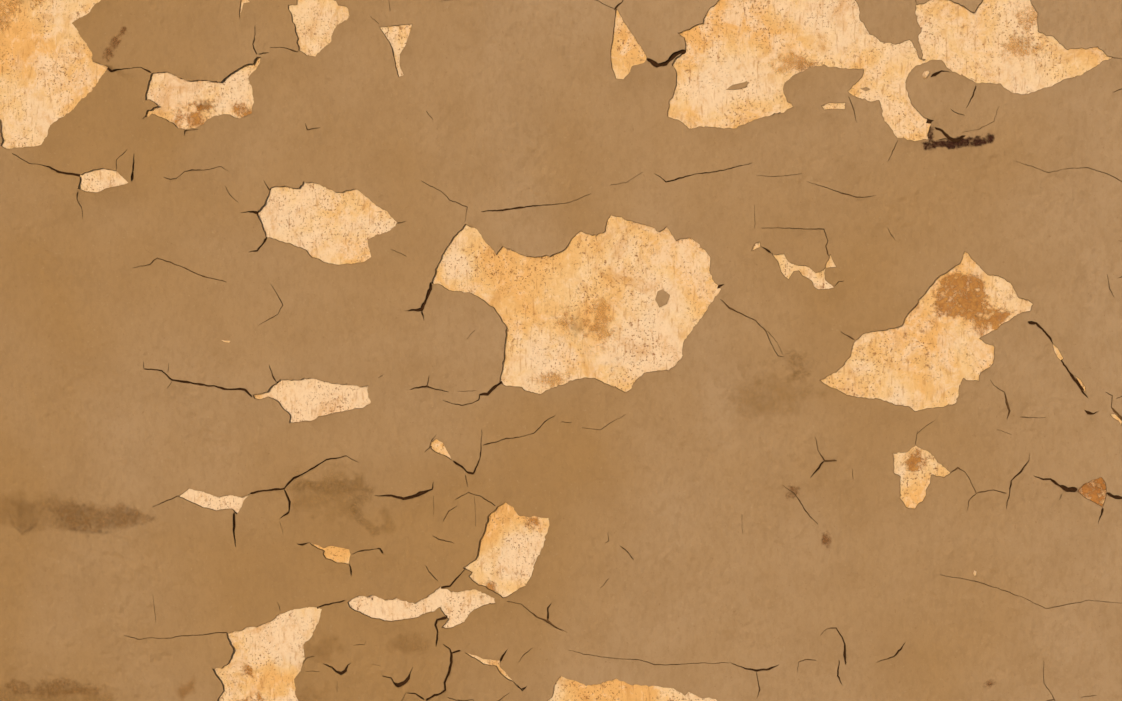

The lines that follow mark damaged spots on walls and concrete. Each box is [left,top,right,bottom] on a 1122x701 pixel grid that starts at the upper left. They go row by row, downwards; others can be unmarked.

peeling [0,0,113,149]
peeling [667,0,1112,147]
peeling [253,176,397,265]
crack [147,369,252,396]
peeling [426,215,723,396]
peeling [821,251,1035,411]
crack [1028,321,1122,420]
crack [233,456,344,544]
crack [376,417,552,542]
crack [950,462,1077,504]
peeling [349,498,549,633]
crack [384,615,467,701]